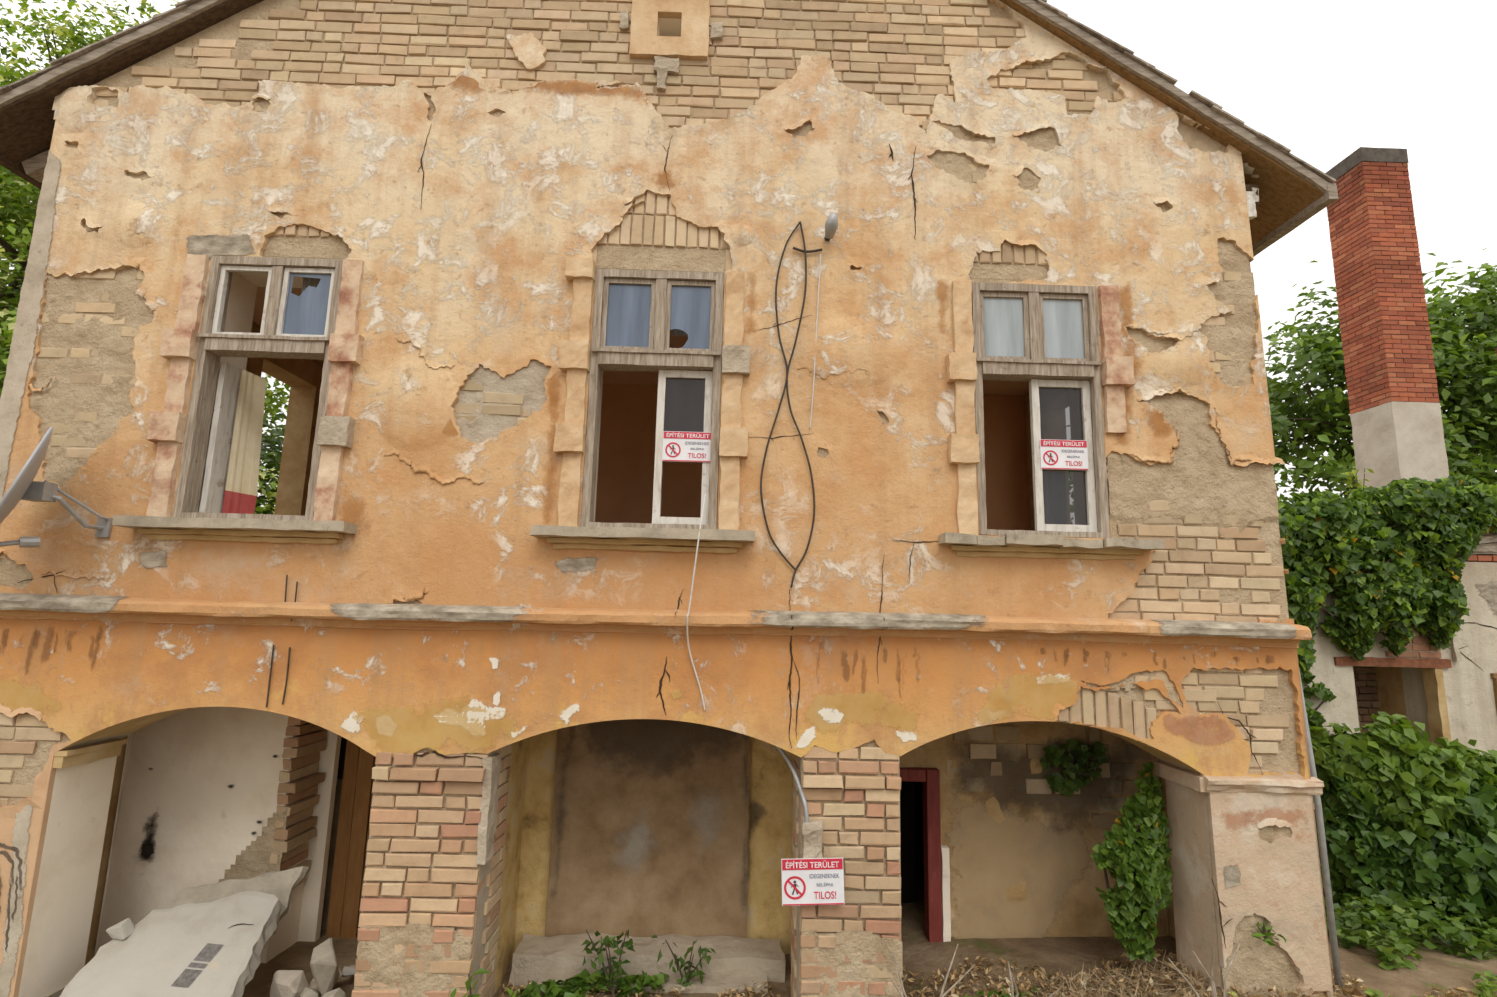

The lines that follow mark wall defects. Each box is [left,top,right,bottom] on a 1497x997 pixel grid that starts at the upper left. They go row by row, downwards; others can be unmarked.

flaking render [93,0,1124,185]
flaking render [28,263,157,488]
flaking render [397,337,551,443]
flaking render [589,191,732,273]
flaking render [969,238,1047,280]
flaking render [1126,239,1257,388]
flaking render [1107,386,1288,622]
crack [1450,622,1497,671]
flaking render [0,679,71,807]
flaking render [946,721,1051,792]
flaking render [1036,667,1299,829]
flaking render [1225,808,1304,843]